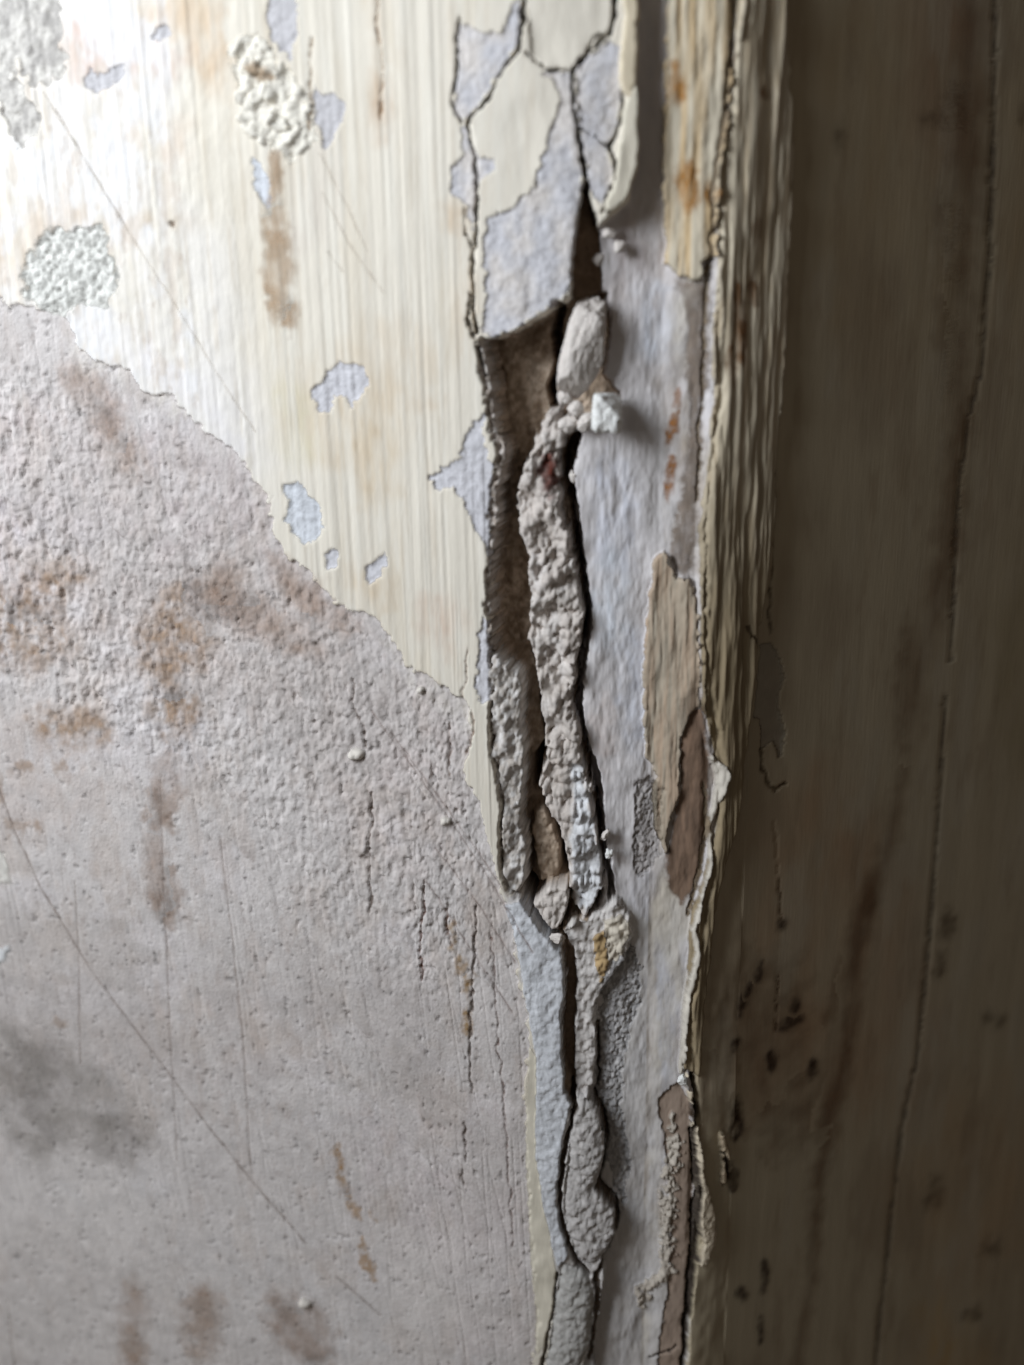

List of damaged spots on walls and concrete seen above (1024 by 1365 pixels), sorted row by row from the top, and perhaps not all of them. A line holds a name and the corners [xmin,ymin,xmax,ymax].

peeling [0,0,642,1365]
crack [454,0,623,376]
crack [541,920,619,1365]
peeling [632,0,794,1365]